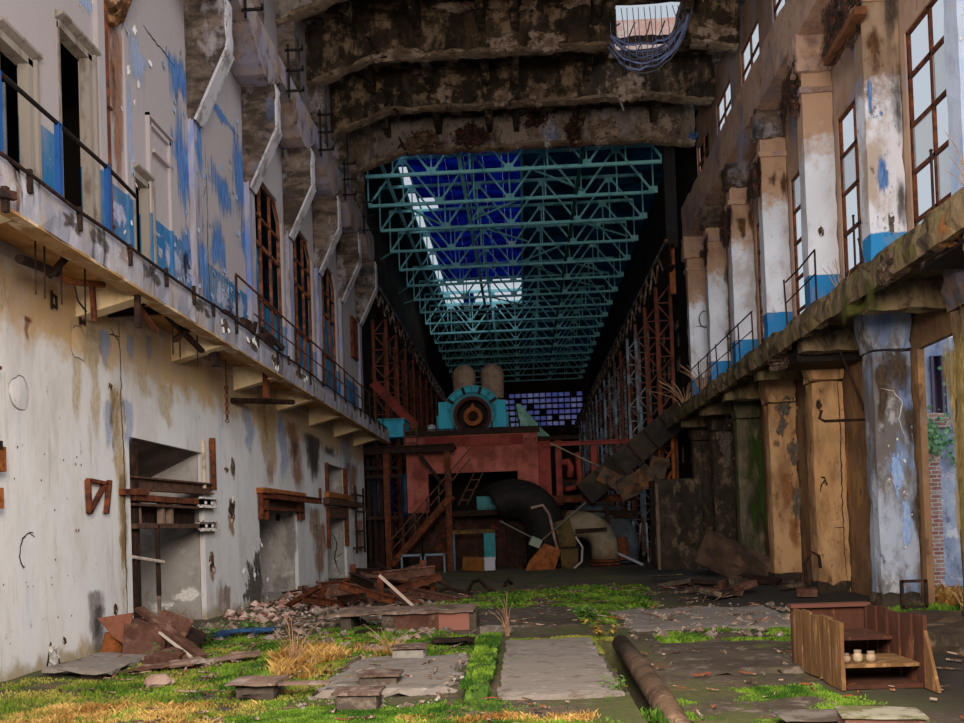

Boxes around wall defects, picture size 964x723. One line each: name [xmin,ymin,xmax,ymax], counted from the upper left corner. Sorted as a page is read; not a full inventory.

spalling [368,45,431,63]
spalling [431,0,475,15]
spalling [484,29,567,54]
spalling [607,0,738,105]
water stain [867,0,897,69]
corrosion [108,26,123,174]
spalling [401,82,622,153]
spalling [635,112,681,141]
peeling [121,25,257,333]
water stain [73,330,112,441]
peeling [888,438,913,548]
water stain [89,591,103,651]